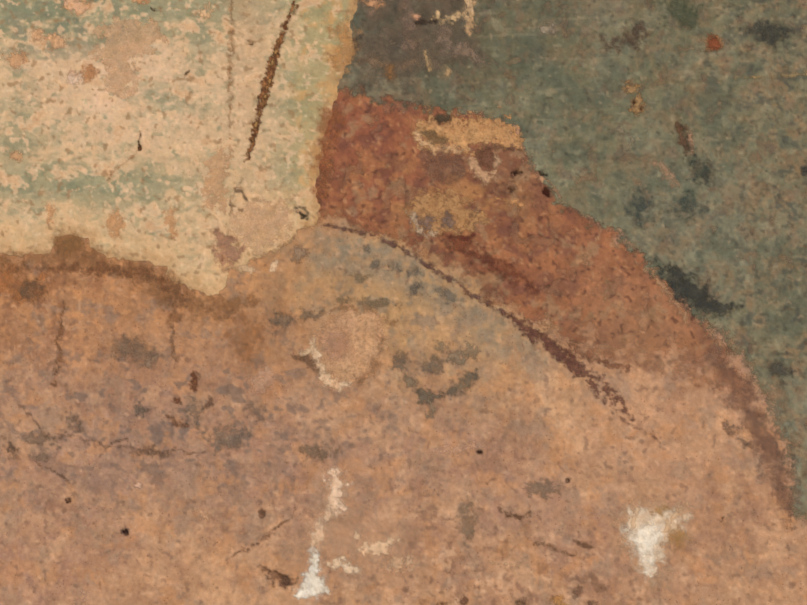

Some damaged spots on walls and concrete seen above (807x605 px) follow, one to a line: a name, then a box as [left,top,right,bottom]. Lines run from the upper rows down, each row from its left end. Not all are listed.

peeling [63,0,91,16]
peeling [67,64,100,85]
crack [246,1,299,160]
flaking render [411,110,524,185]
flaking render [404,188,489,241]
flaking render [212,228,255,274]
water stain [294,468,360,599]
water stain [354,532,416,572]
water stain [616,500,691,584]